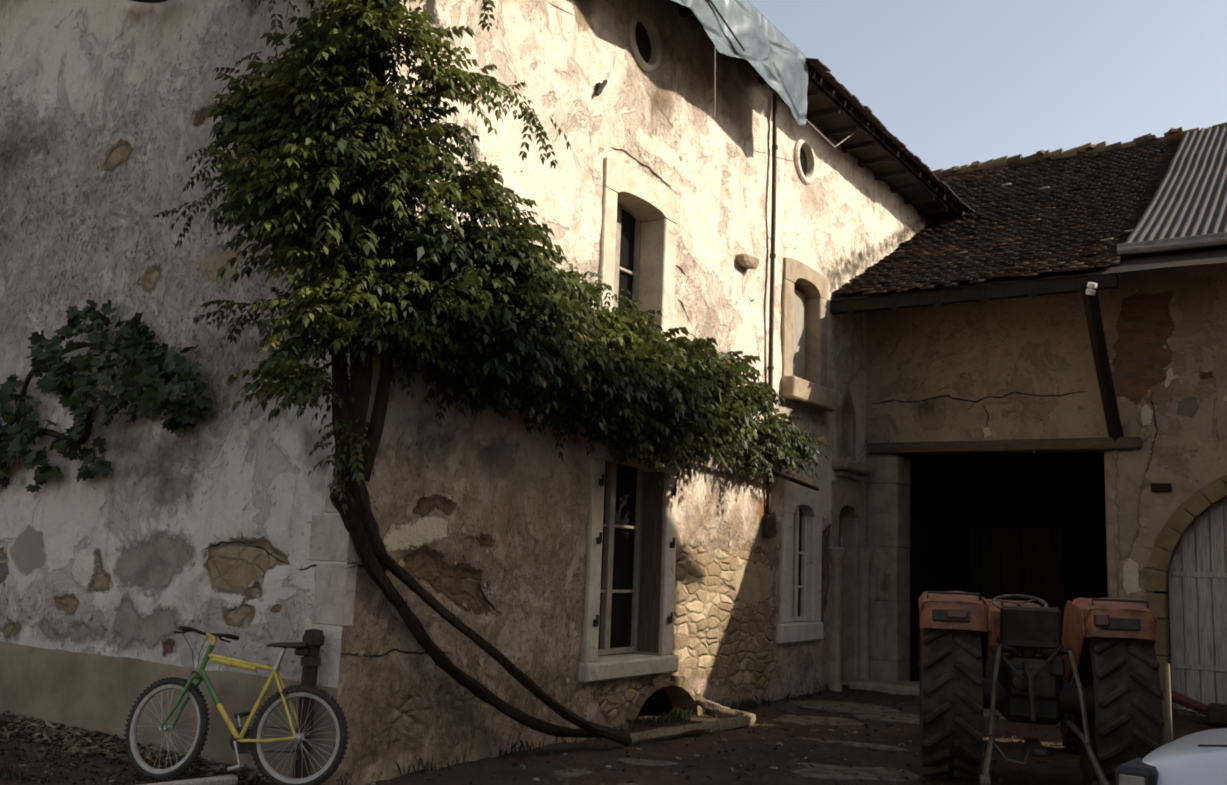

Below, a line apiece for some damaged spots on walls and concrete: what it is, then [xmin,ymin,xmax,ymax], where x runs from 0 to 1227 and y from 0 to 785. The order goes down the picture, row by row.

flaking render [189,100,235,126]
flaking render [101,121,132,180]
flaking render [135,259,162,298]
flaking render [1109,289,1184,432]
crack [873,391,1087,426]
flaking render [383,494,499,614]
flaking render [38,523,289,656]
flaking render [1122,558,1144,597]
flaking render [0,619,21,638]